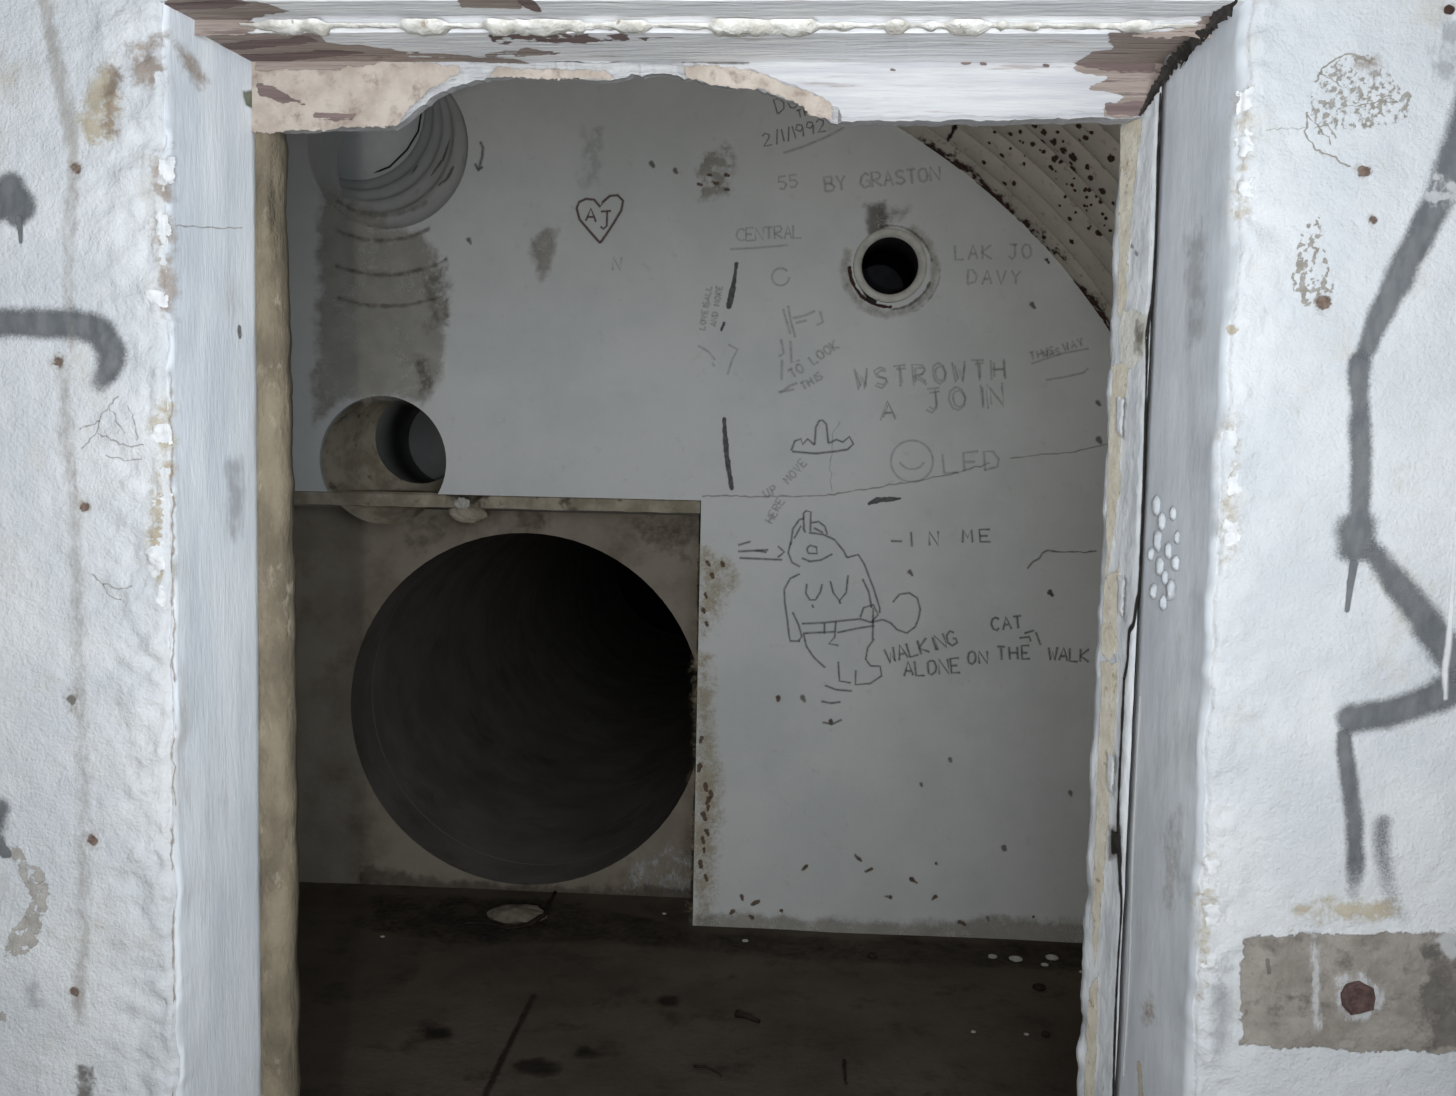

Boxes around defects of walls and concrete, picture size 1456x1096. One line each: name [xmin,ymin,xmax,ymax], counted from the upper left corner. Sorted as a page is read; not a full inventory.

peeling [165,0,669,134]
spalling [685,64,834,121]
corrosion [918,124,1115,260]
water stain [314,201,445,414]
corrosion [1074,281,1110,331]
corrosion [701,555,734,627]
corrosion [695,657,716,891]
peeling [0,847,50,957]
corrosion [1336,973,1384,1018]